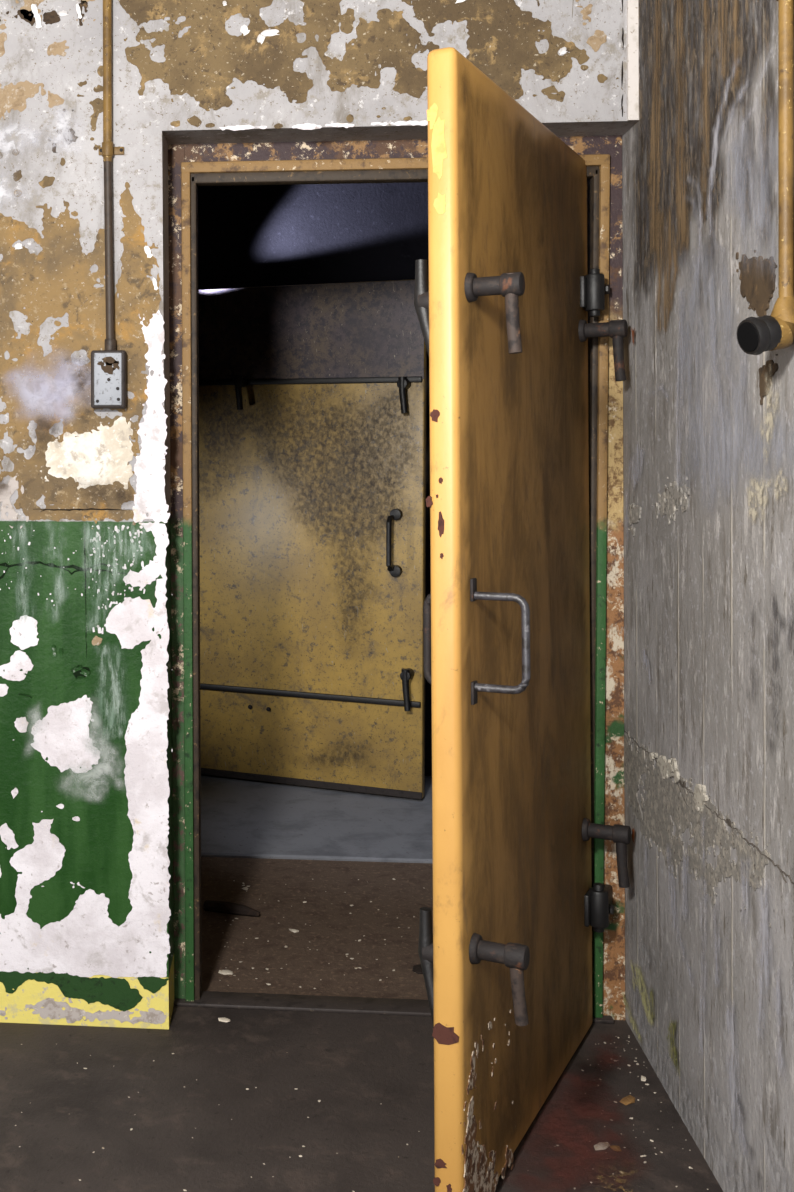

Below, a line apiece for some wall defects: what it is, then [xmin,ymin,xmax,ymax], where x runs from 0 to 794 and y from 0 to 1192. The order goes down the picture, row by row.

peeling [13,170,22,197]
peeling [0,65,103,188]
peeling [0,182,173,978]